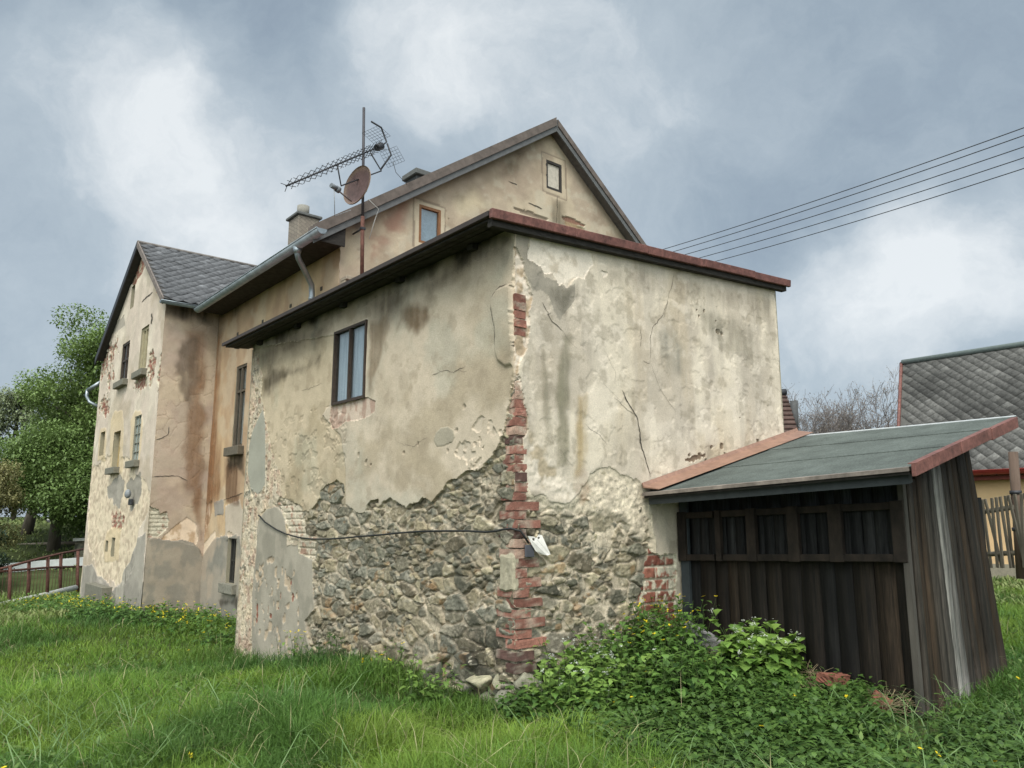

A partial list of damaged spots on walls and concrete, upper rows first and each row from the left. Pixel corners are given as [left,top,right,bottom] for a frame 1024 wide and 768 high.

spalling [87,238,678,704]
leakage [558,366,567,461]
crack [604,353,651,477]